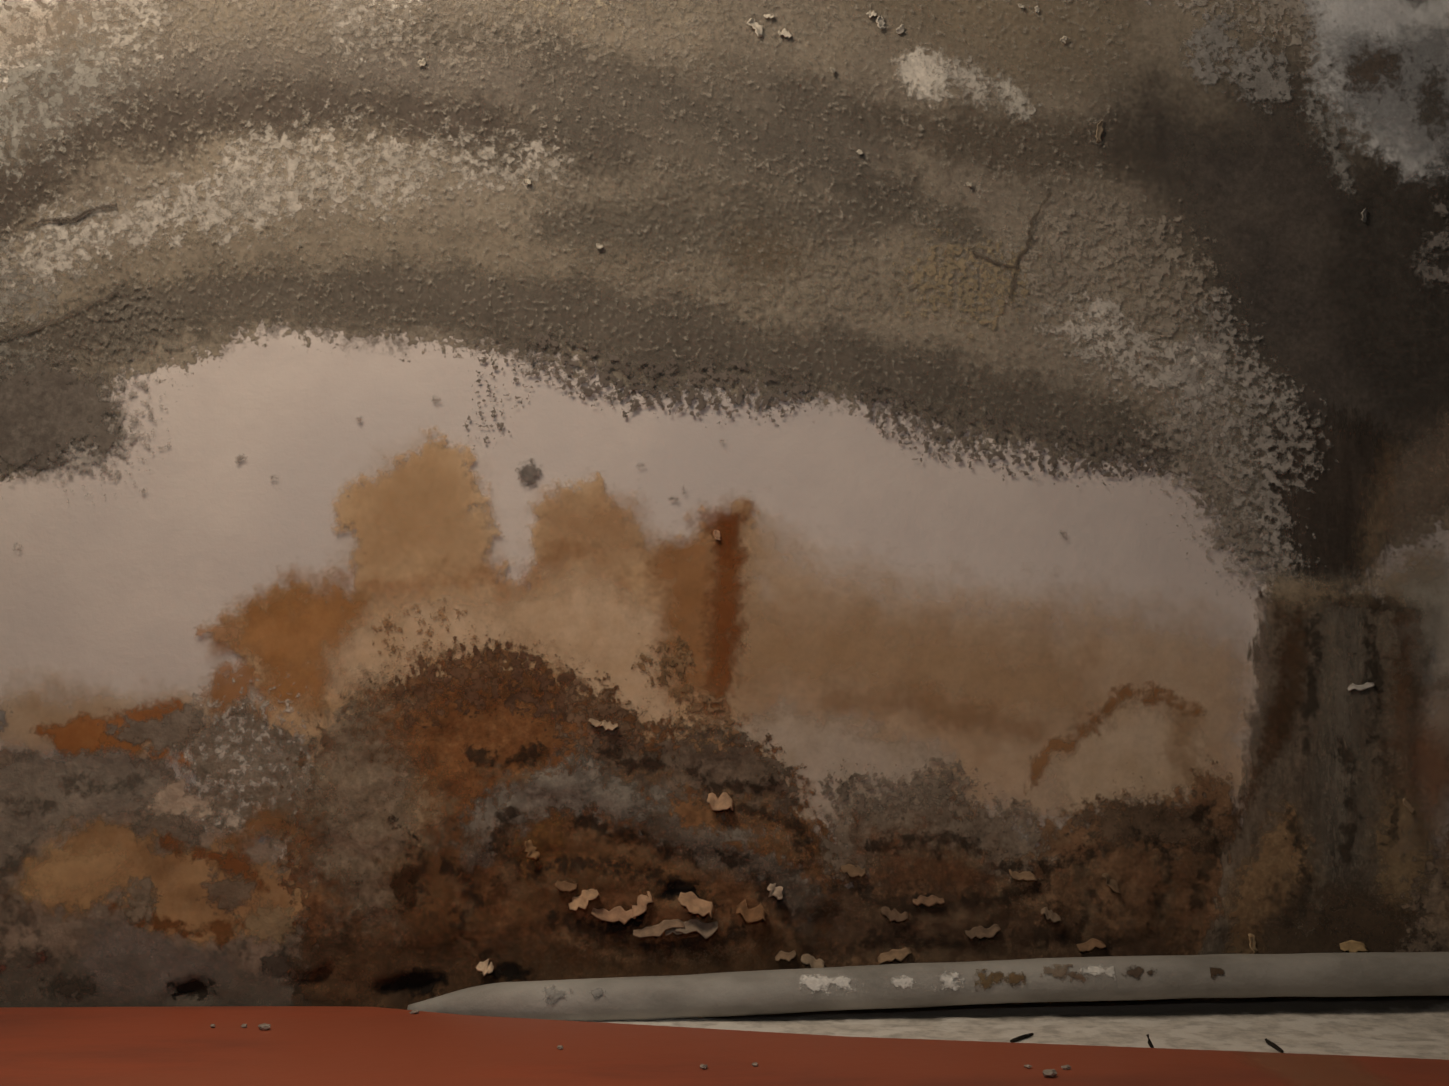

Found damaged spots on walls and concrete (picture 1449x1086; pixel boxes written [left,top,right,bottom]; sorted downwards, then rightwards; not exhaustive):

crack [27,204,117,227]
crack [972,192,1052,299]
water stain [465,370,510,433]
water stain [516,459,541,486]
corrosion [0,428,1252,822]
flaking render [0,598,1244,1010]
water stain [1399,857,1449,952]